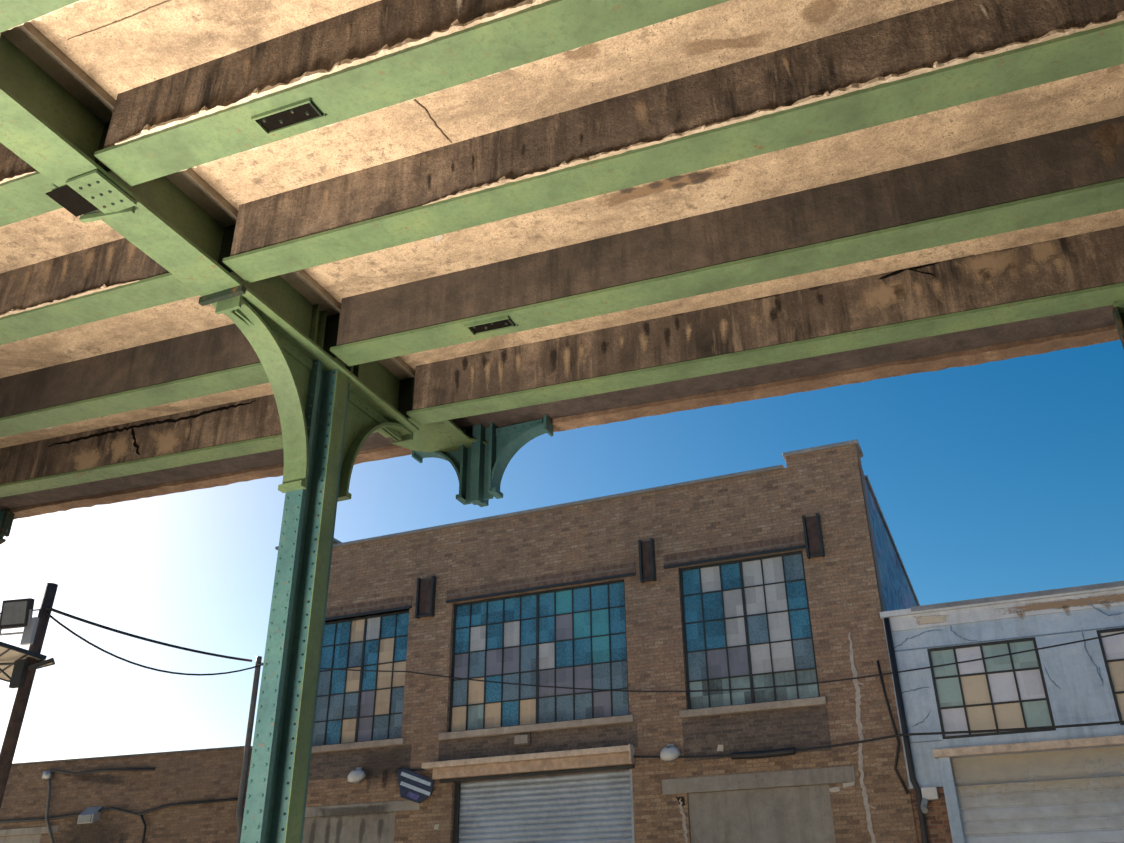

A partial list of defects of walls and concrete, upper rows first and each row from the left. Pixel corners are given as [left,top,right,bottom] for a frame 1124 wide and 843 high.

crack [68,0,172,40]
crack [413,99,452,143]
crack [894,625,977,648]
crack [1081,604,1124,687]
crack [848,632,876,843]